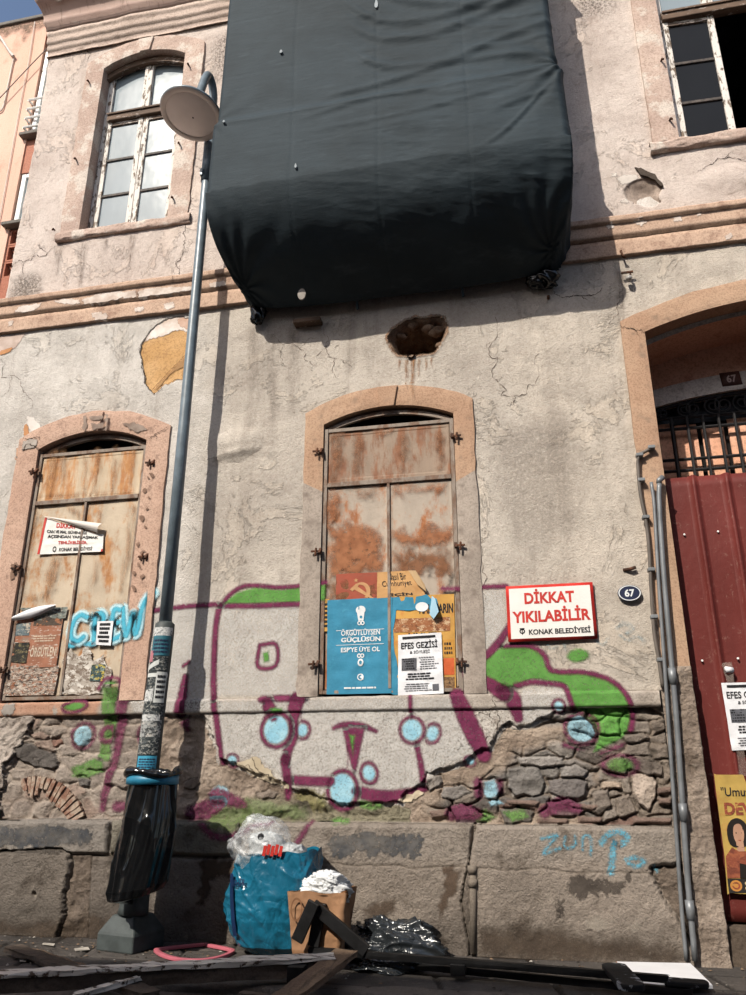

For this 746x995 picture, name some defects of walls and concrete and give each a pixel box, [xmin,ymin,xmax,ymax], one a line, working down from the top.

flaking render [55,286,192,395]
spalling [385,314,449,359]
crack [486,317,539,405]
rust [327,494,383,600]
rust [393,521,453,582]
flaking render [0,715,142,820]
flaking render [159,699,674,827]